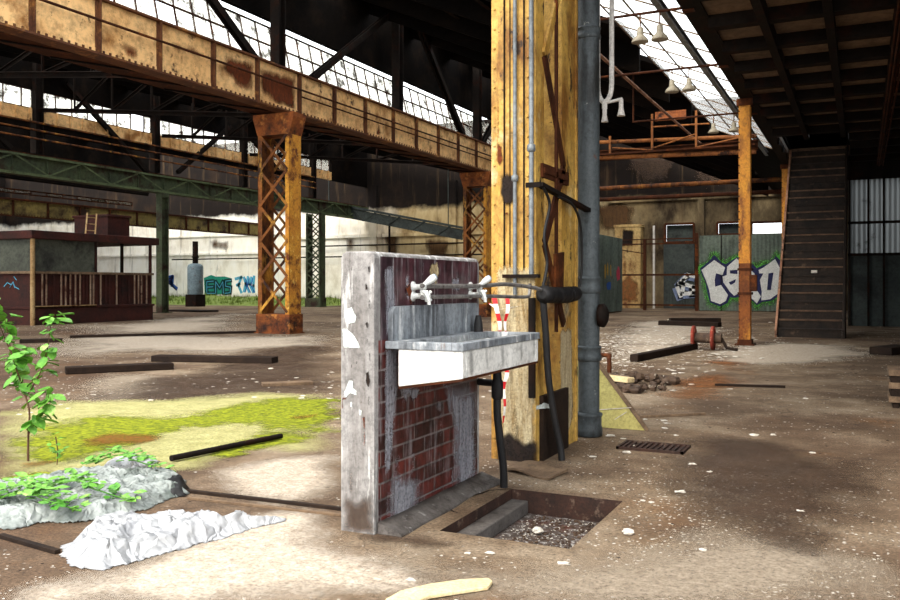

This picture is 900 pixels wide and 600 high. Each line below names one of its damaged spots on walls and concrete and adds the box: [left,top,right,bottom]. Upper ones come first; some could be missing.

rust [224,60,295,108]
peeling [342,307,368,348]
peeling [344,381,362,415]
efflorescence [386,350,419,471]
efflorescence [449,394,475,482]